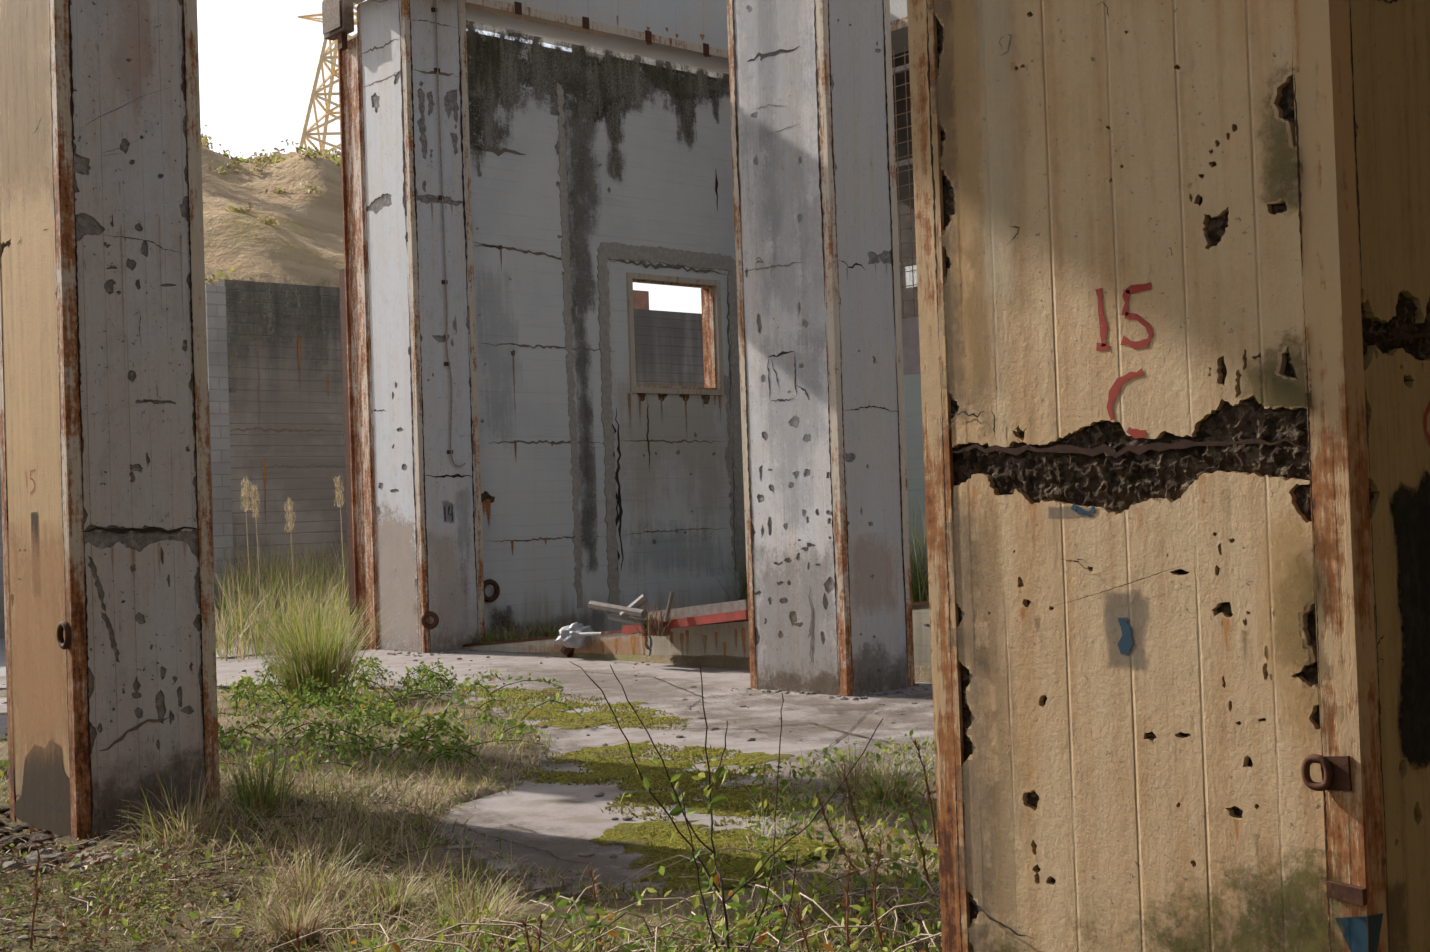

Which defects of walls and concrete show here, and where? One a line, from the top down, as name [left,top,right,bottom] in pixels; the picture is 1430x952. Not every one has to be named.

spalling [1278,78,1295,127]
crack [17,0,206,822]
crack [230,323,345,469]
water stain [466,20,730,570]
crack [361,0,908,687]
spalling [952,358,1312,521]
spalling [1199,197,1229,247]
spalling [1361,293,1430,360]
spalling [83,507,201,663]
peeling [112,663,202,724]
crack [554,636,916,784]
water stain [15,739,71,836]